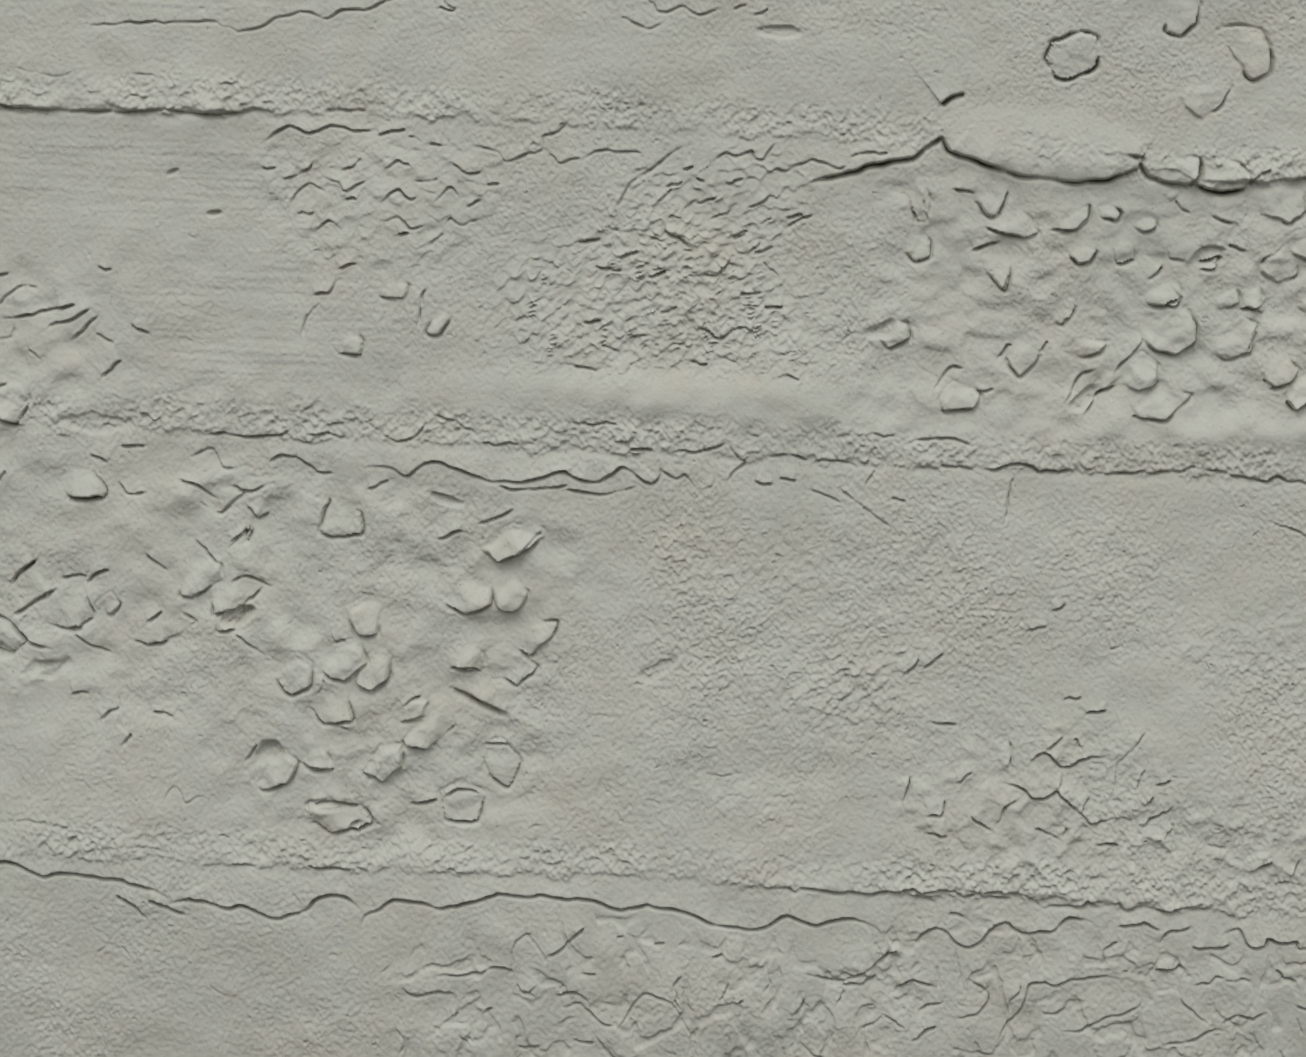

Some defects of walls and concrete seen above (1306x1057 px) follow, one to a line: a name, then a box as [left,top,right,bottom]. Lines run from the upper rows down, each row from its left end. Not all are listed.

crack [0,100,410,146]
crack [60,0,459,38]
crack [470,90,1247,215]
flaking render [1044,30,1103,84]
flaking render [1163,0,1204,39]
flaking render [1169,23,1275,123]
spalling [253,127,1306,438]
crack [203,410,1306,544]
spalling [0,258,582,852]
crack [0,858,1306,990]